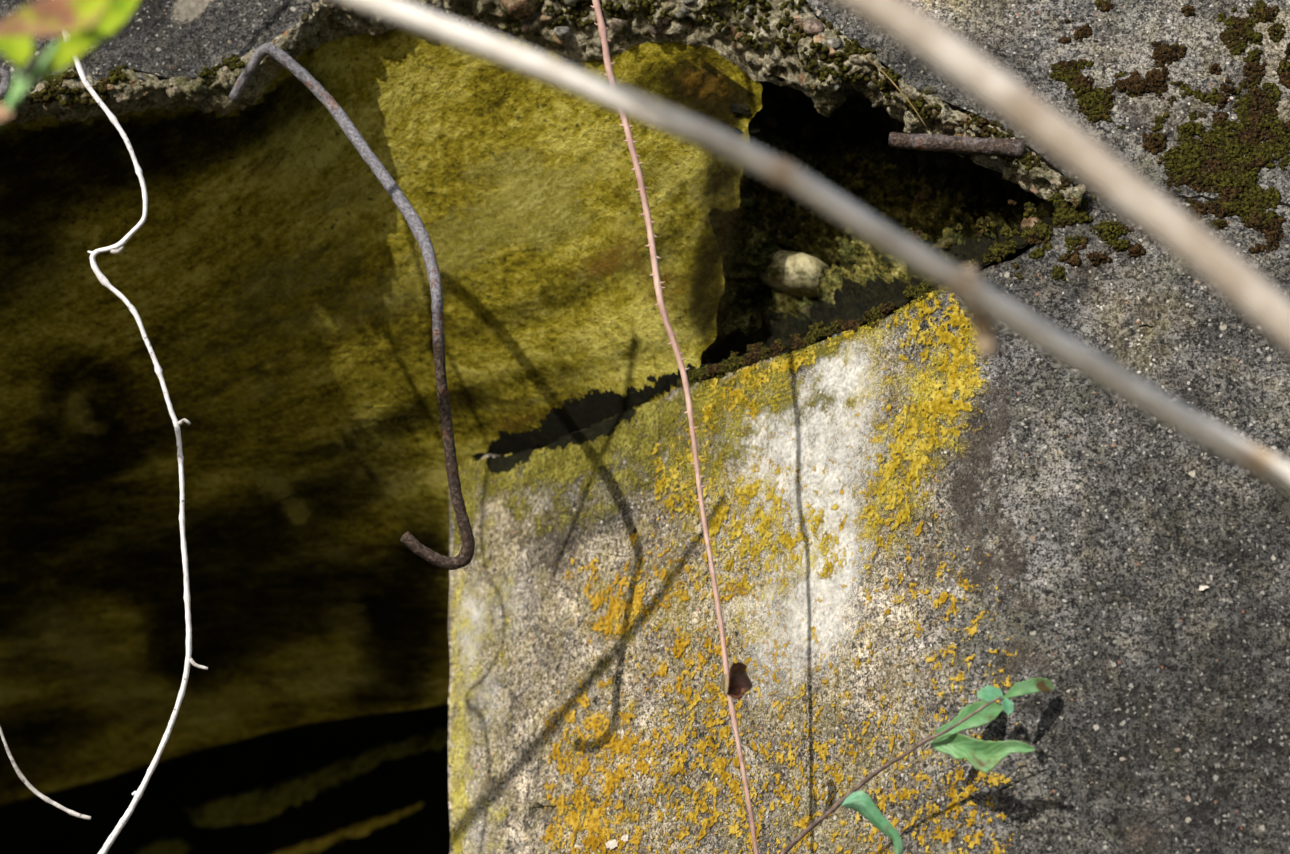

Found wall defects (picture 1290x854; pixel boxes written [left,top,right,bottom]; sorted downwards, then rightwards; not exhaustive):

water stain [0,79,318,309]
spalling [0,0,475,570]
spalling [403,0,1086,274]
spalling [686,168,940,382]
water stain [0,356,495,709]
water stain [0,705,87,784]